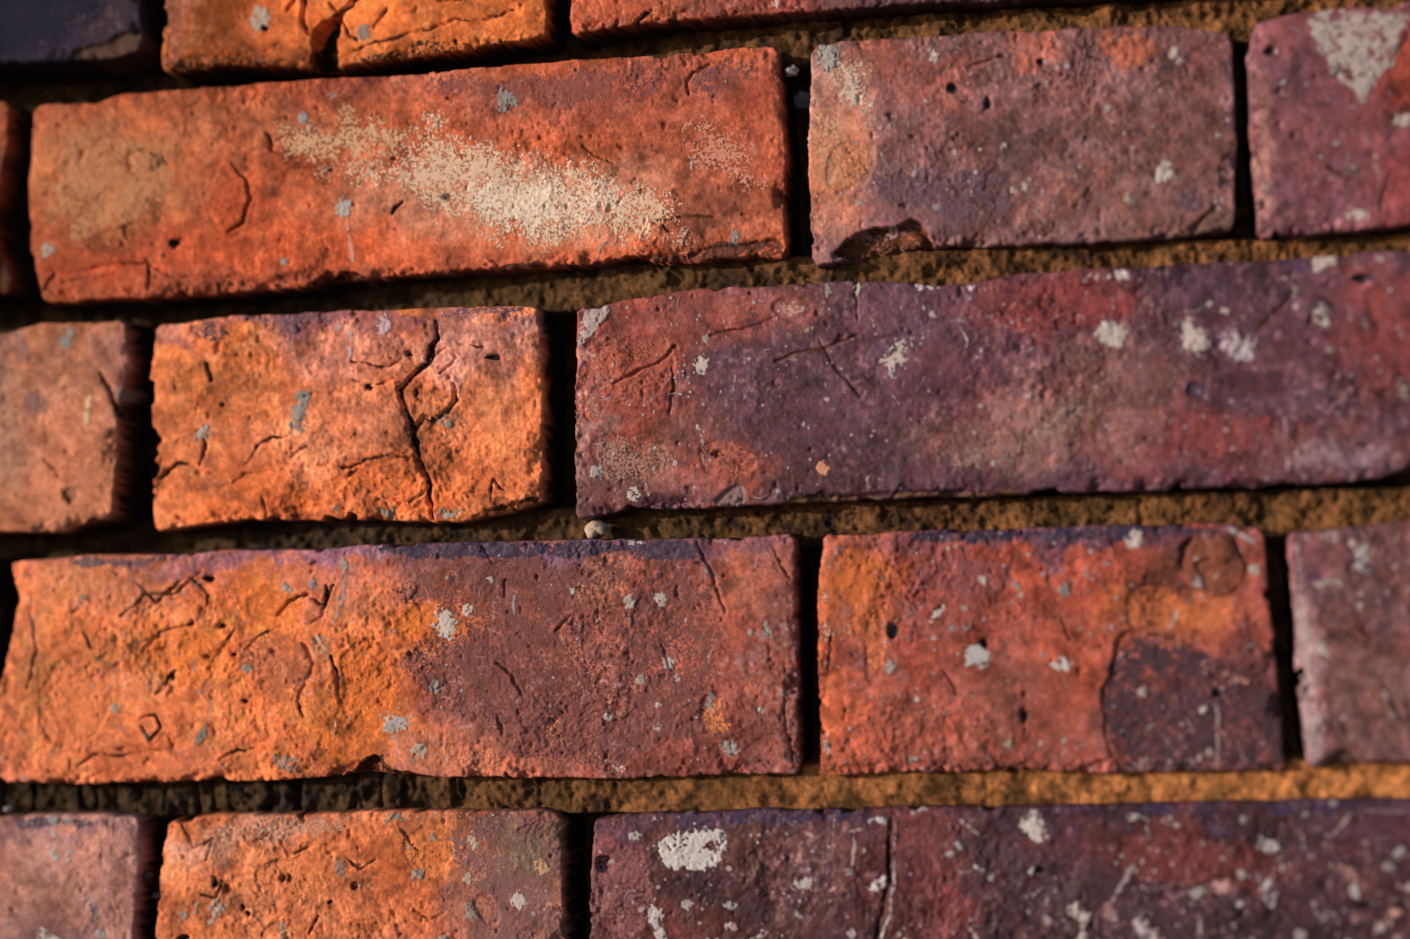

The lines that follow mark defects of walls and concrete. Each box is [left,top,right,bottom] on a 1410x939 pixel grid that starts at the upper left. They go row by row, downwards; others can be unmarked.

spalling [310,27,349,79]
leakage [270,103,699,267]
crack [205,362,213,382]
crack [339,320,483,519]
crack [155,439,208,488]
crack [233,435,308,508]
crack [490,478,505,499]
crack [77,573,210,766]
crack [222,584,335,649]
crack [298,654,338,717]
spalling [1098,531,1284,773]
crack [874,825,892,939]